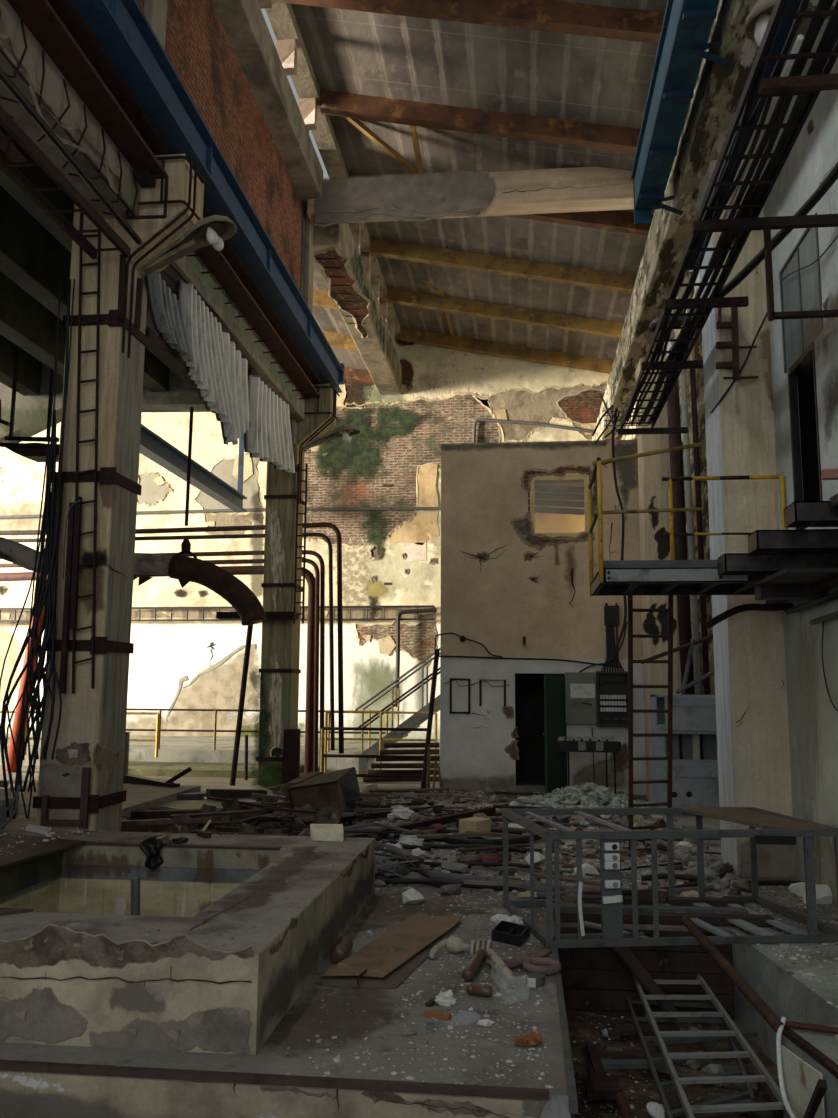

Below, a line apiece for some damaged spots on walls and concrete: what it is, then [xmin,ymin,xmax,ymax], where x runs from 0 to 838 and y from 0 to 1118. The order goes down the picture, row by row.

spalling [314,247,371,339]
damp [719,317,773,403]
flaking render [302,339,608,561]
crack [461,545,541,584]
corrosion [174,589,206,597]
flaking render [304,608,439,667]
spalling [54,740,119,777]
flaking render [0,916,299,969]
crack [1,968,251,985]
crack [390,1101,515,1117]